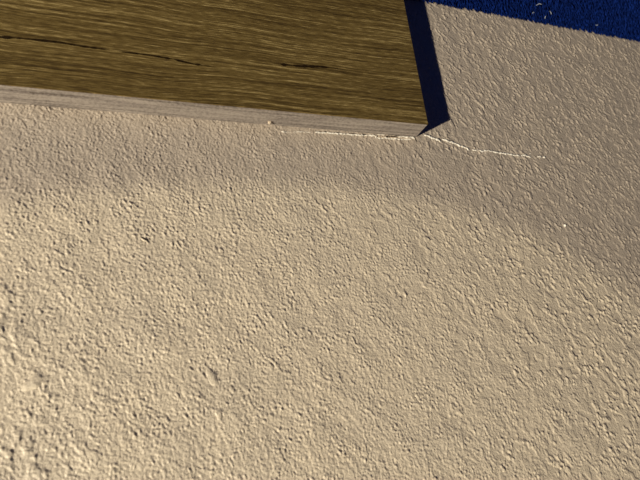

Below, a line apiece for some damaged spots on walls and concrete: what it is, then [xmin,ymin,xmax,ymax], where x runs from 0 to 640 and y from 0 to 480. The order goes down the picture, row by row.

crack [424,135,546,159]